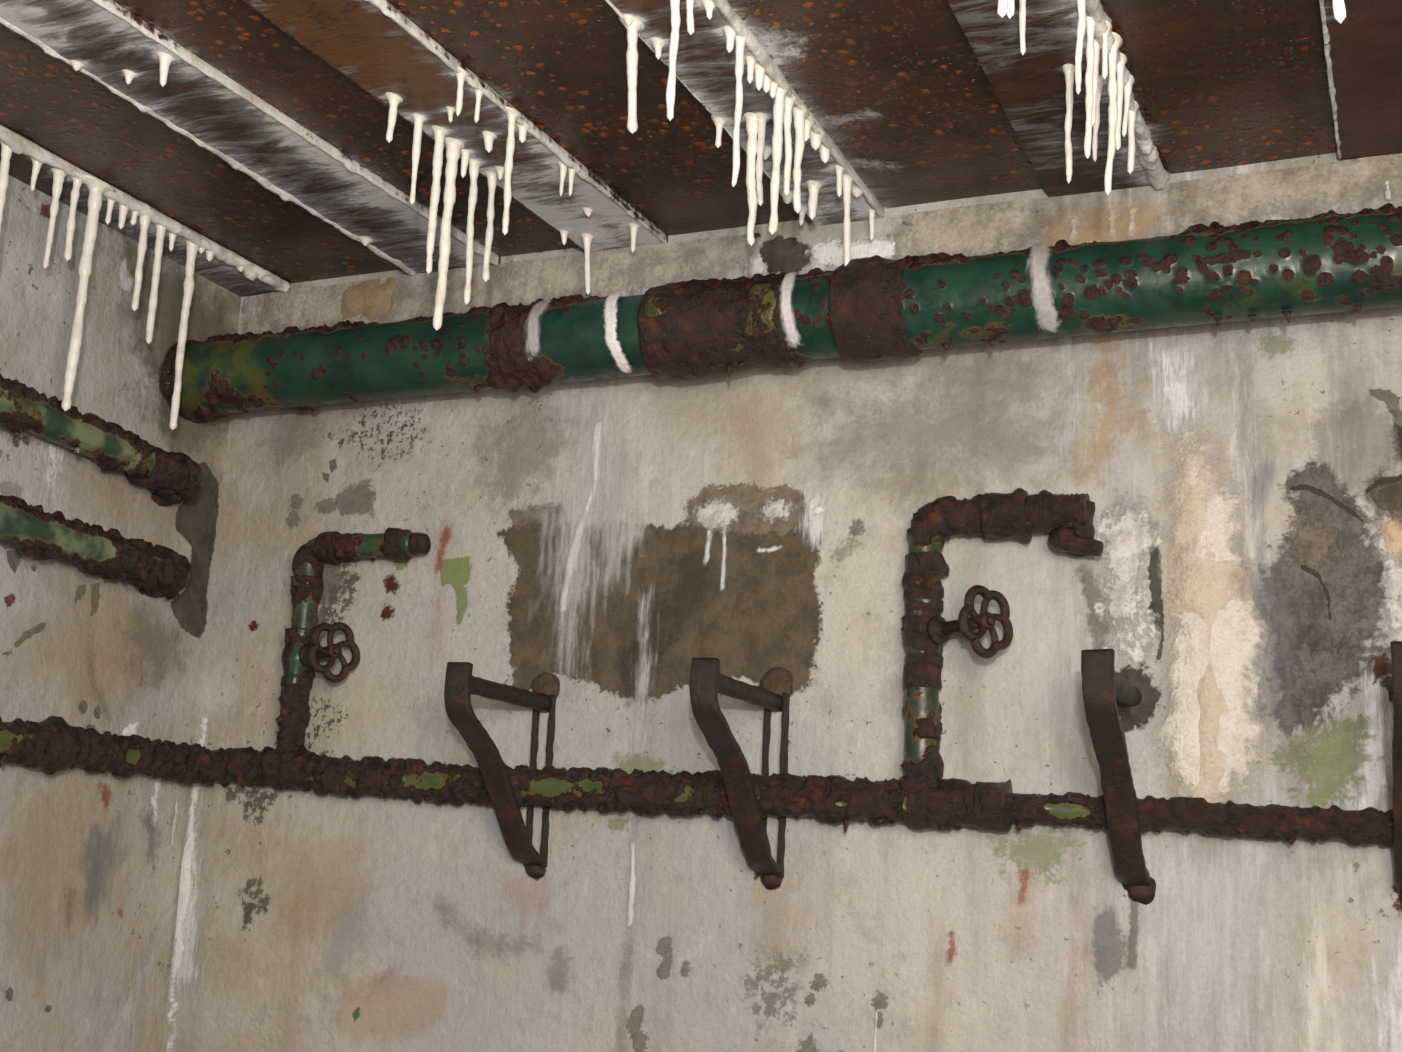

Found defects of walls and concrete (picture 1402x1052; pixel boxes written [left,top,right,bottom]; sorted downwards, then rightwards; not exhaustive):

damp [0,0,499,292]
damp [369,0,666,243]
damp [713,0,890,217]
damp [1086,0,1170,189]
damp [1319,0,1342,160]
damp [125,242,236,374]
damp [744,169,902,347]
damp [158,392,220,452]
peeling [1369,389,1402,427]
damp [552,383,643,672]
damp [630,600,649,755]
flaking render [1259,461,1390,736]